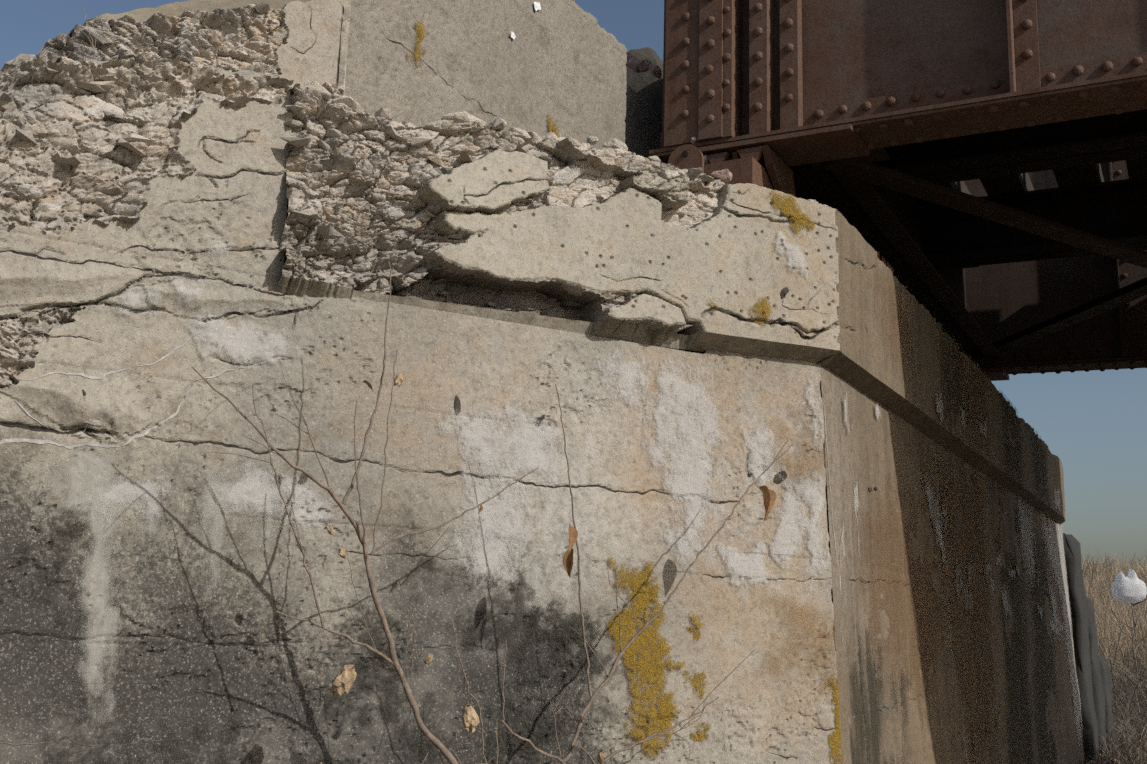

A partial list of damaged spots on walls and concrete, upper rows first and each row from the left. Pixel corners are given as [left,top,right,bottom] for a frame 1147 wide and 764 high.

crack [161,131,285,206]
spalling [0,3,728,335]
crack [464,178,544,203]
spalling [0,306,84,388]
crack [0,245,737,503]
crack [679,294,868,340]
damp [925,481,1083,748]
damp [851,640,906,764]